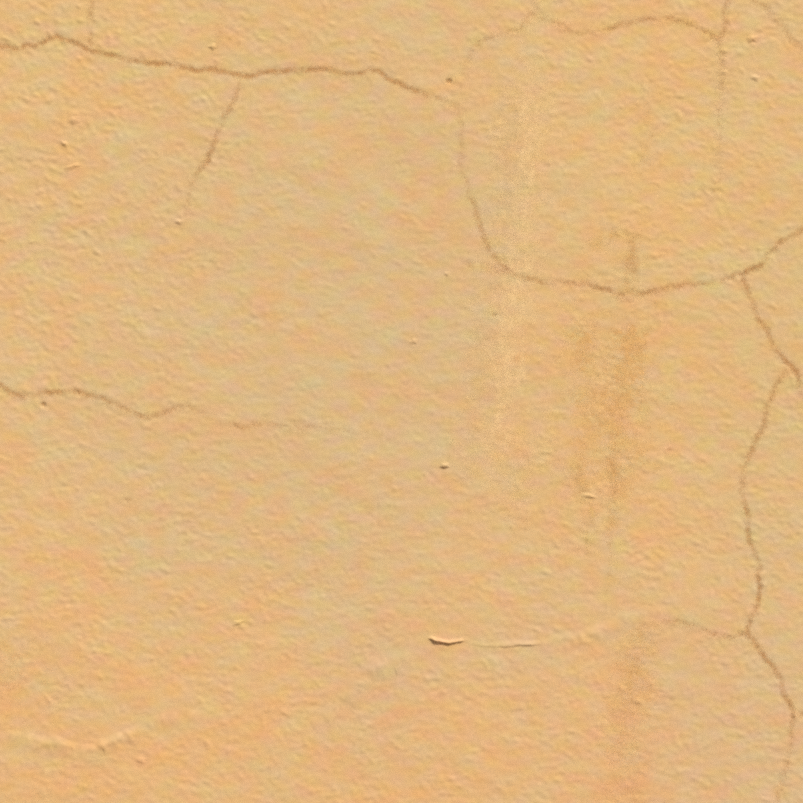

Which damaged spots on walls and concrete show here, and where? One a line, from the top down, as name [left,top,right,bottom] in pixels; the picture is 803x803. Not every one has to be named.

crack [0,2,460,214]
crack [462,0,732,195]
crack [0,382,362,436]
crack [458,120,803,743]